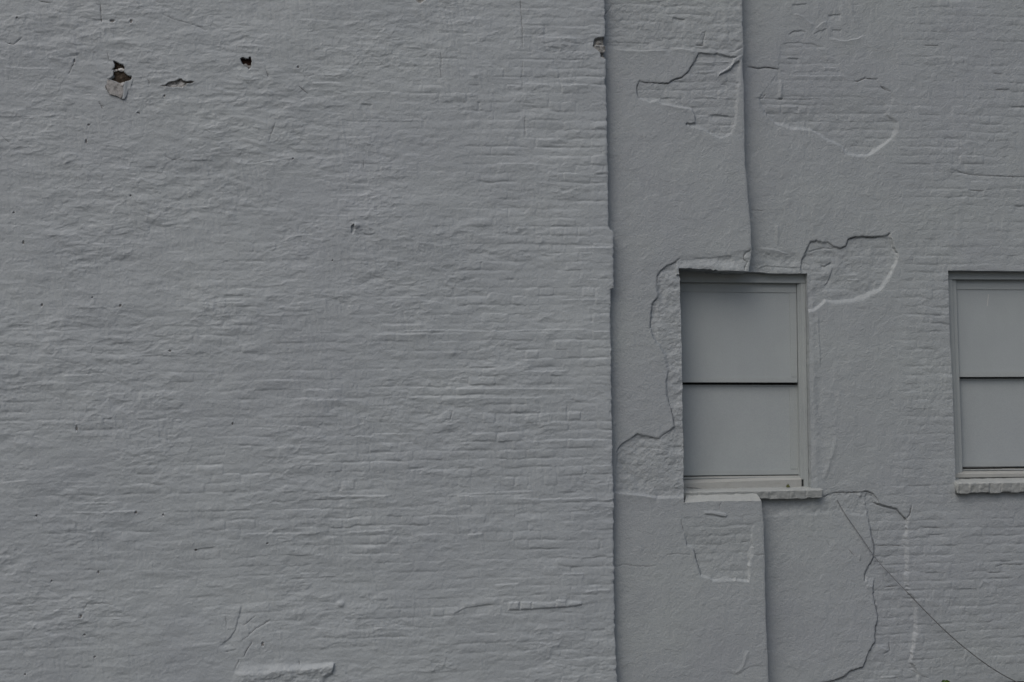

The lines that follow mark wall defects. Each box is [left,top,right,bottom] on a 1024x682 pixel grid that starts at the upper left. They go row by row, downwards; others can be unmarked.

peeling [105,61,133,99]
flaking render [593,0,743,139]
flaking render [758,42,899,157]
flaking render [613,232,899,499]